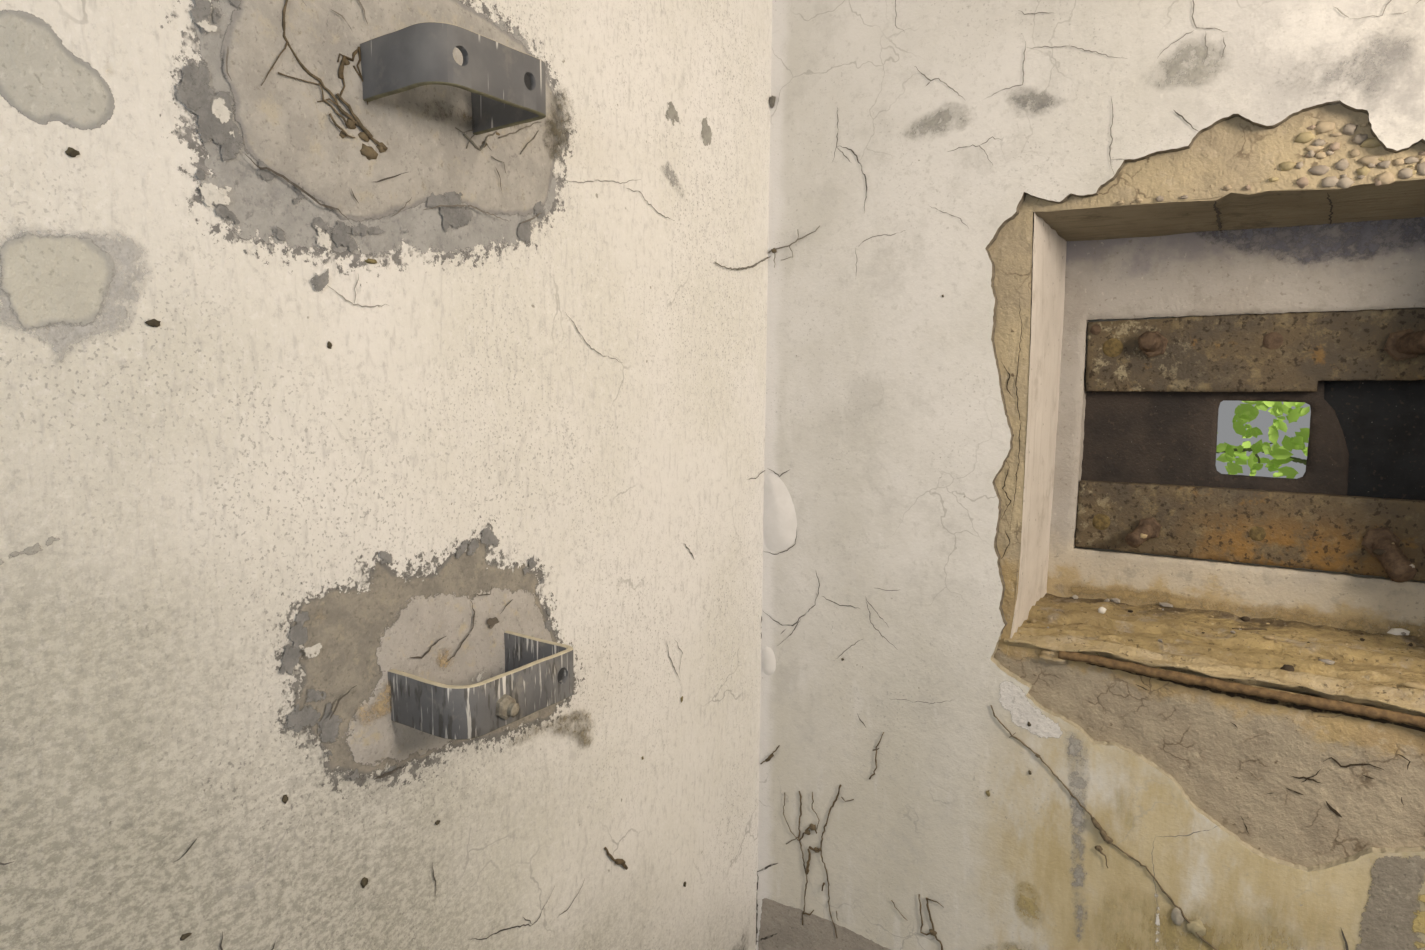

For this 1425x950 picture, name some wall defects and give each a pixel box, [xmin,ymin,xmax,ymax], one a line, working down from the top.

crack [915,0,1227,100]
crack [1334,0,1420,19]
peeling [159,0,577,291]
flaking render [988,104,1425,950]
peeling [258,515,585,799]
damp [1067,736,1087,887]
crack [1151,825,1220,934]